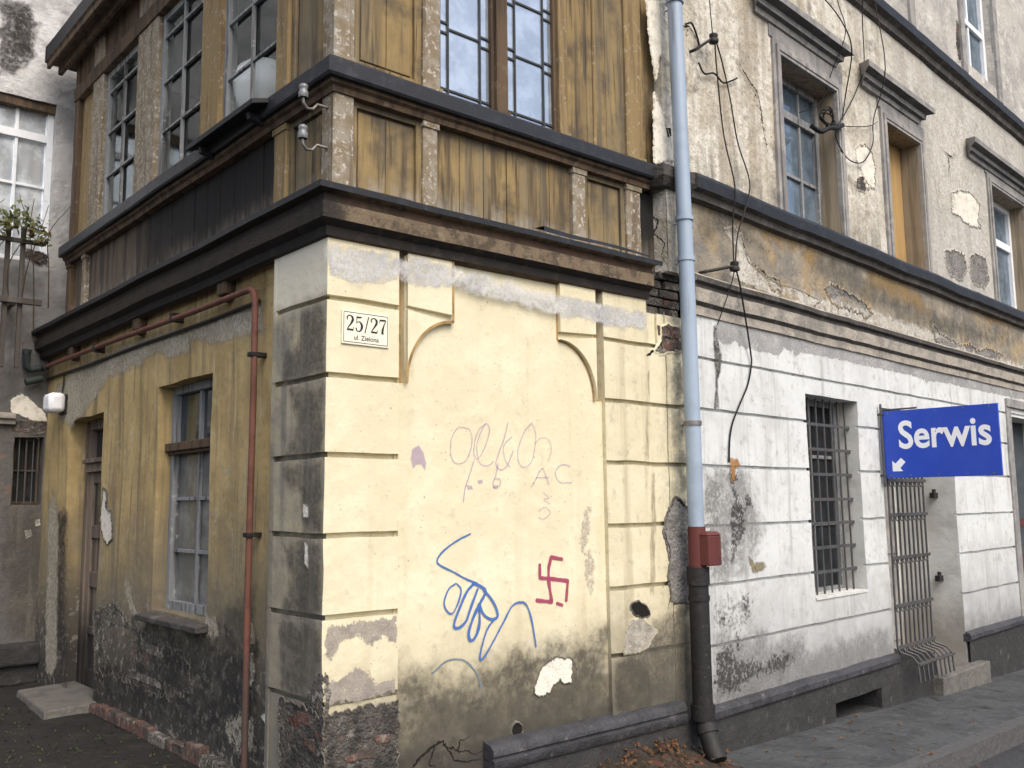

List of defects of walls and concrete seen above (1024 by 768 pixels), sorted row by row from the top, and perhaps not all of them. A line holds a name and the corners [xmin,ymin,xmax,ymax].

peeling [855,142,876,194]
flaking render [723,224,873,320]
flaking render [943,248,990,290]
flaking render [8,392,47,436]
water stain [707,472,753,565]
flaking render [662,495,689,605]
water stain [204,611,219,638]
flaking render [623,600,659,656]
flaking render [533,656,574,698]
water stain [714,629,891,699]
water stain [225,715,254,755]
crack [413,737,483,767]